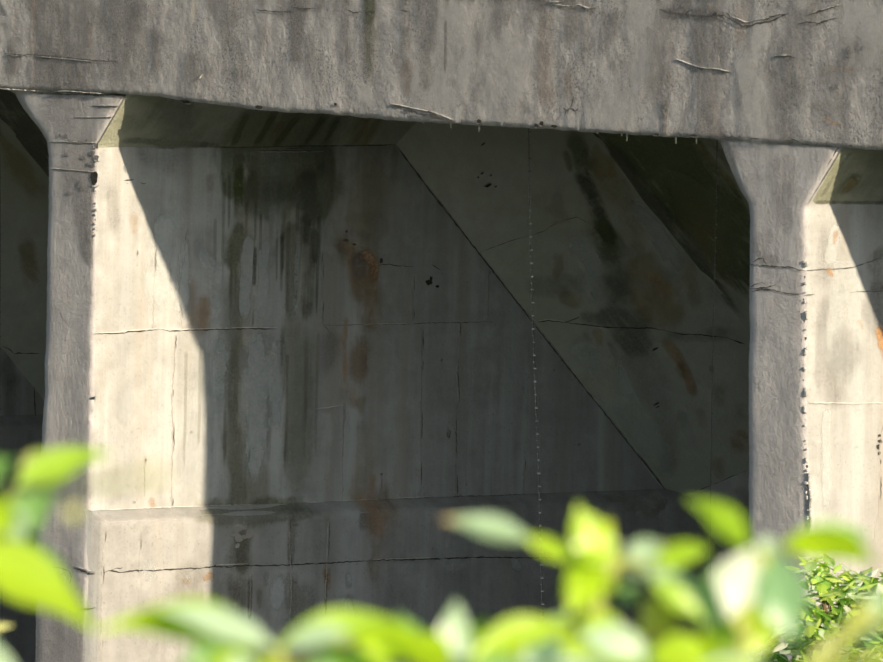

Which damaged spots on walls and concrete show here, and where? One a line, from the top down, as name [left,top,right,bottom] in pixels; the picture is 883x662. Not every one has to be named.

leakage [569,14,750,292]
crack [99,326,274,334]
leakage [225,223,257,312]
crack [249,144,744,489]
crack [749,258,879,295]
crack [64,556,552,581]